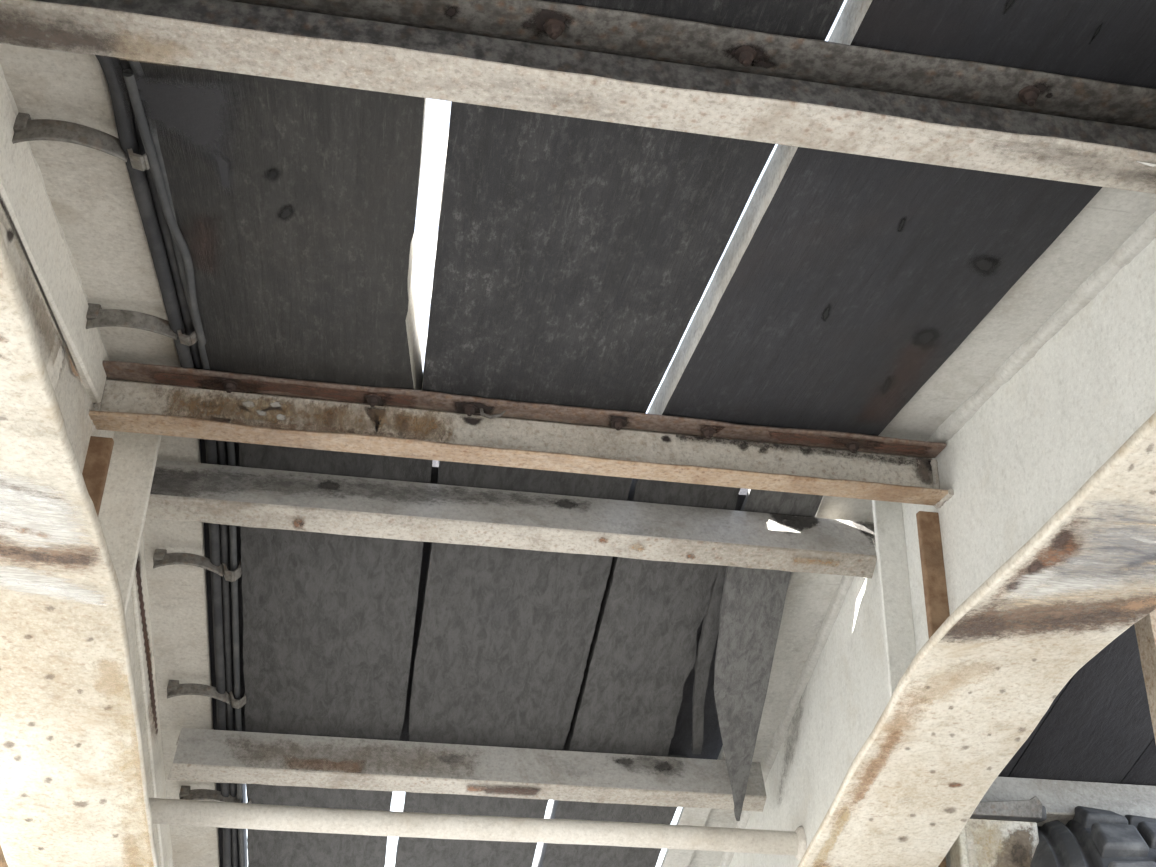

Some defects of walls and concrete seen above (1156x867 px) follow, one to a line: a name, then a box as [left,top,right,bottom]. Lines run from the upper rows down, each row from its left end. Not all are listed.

rust [522,8,572,37]
rust [723,44,776,68]
rust [151,371,494,441]
rust [768,431,930,455]
rust [0,537,99,569]
rust [941,521,1156,640]
water stain [1009,523,1156,608]
rust [855,719,905,799]